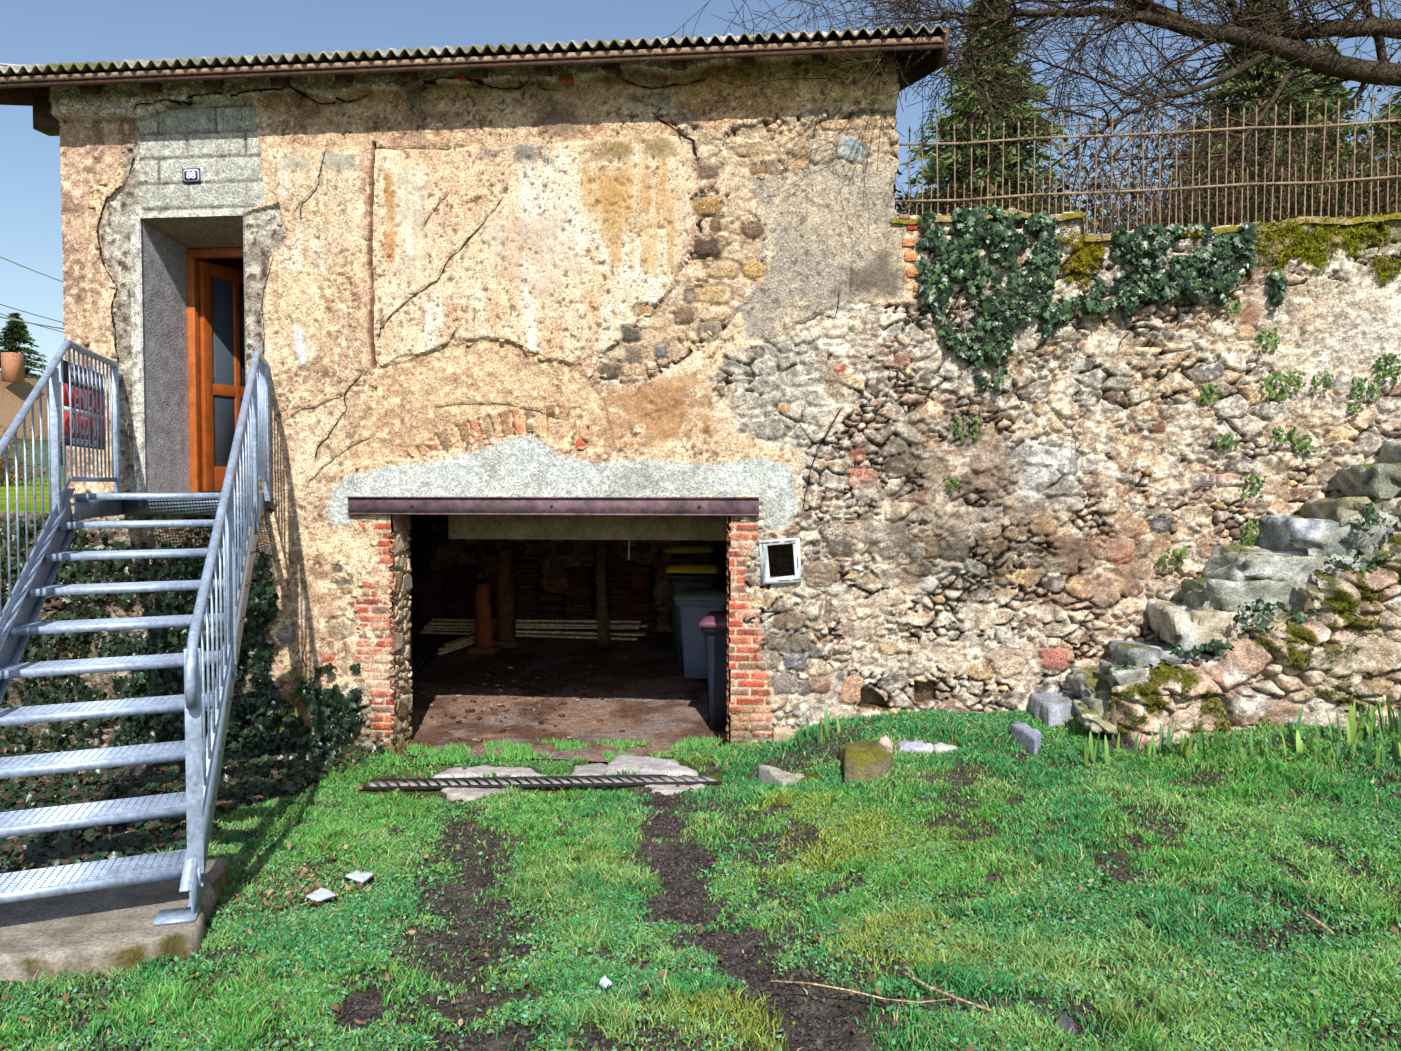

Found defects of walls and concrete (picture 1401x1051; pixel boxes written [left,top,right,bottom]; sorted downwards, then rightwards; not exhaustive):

crack [131,86,366,114]
crack [622,79,705,158]
crack [95,157,134,363]
crack [287,139,502,486]
peeling [343,103,899,469]